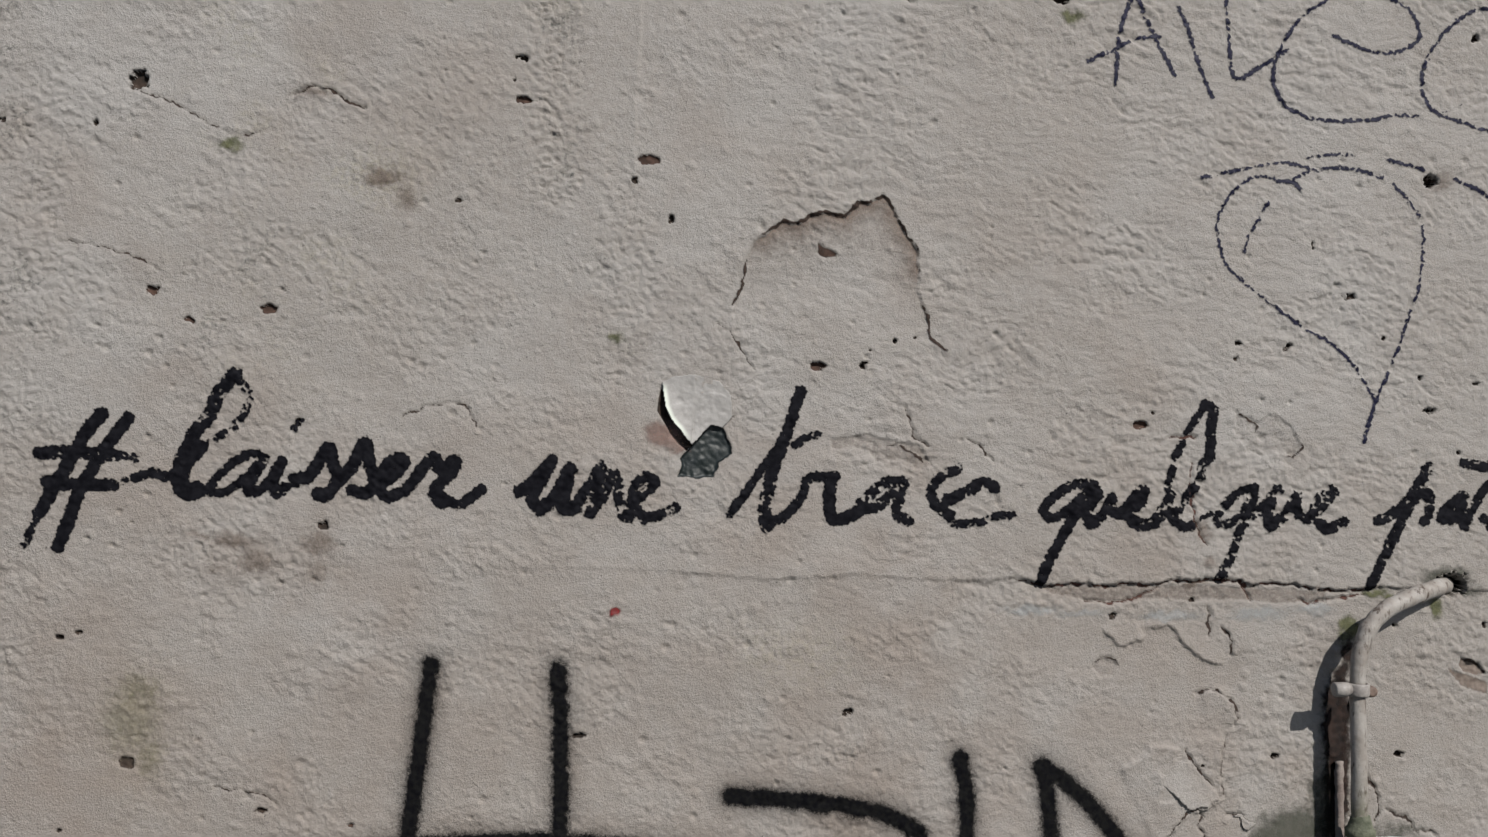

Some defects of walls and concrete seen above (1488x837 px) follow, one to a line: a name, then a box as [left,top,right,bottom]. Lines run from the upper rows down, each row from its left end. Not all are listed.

peeling [757,194,920,278]
peeling [893,305,948,351]
crack [1015,435,1365,653]
crack [1170,689,1239,837]